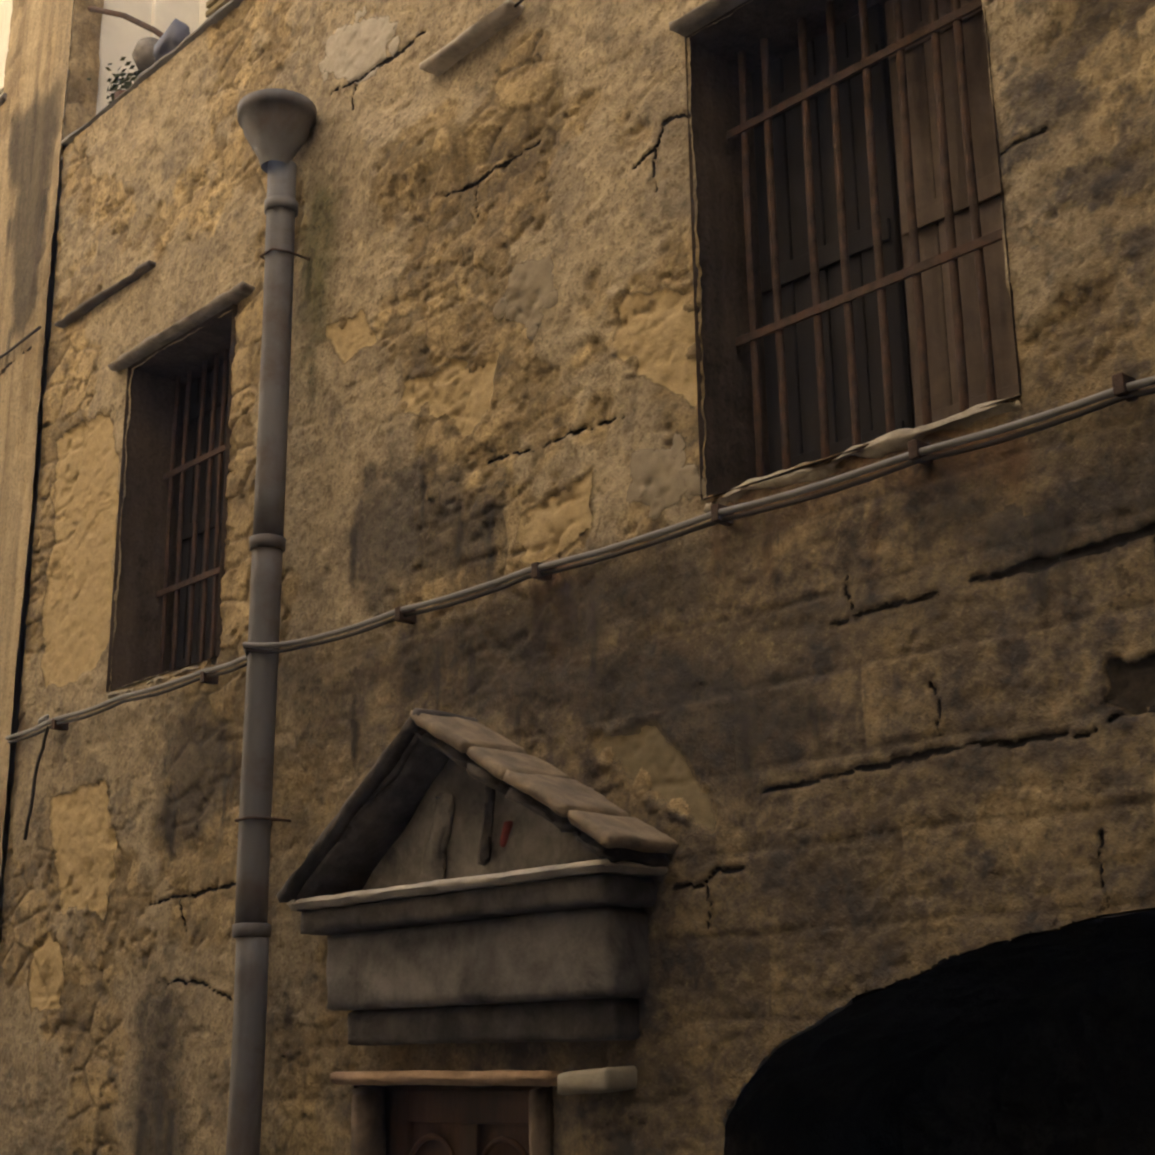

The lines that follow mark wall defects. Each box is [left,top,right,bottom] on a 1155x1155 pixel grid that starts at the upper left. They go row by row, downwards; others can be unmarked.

crack [632,113,691,192]
spalling [1104,647,1155,735]
crack [762,682,1120,794]
crack [1098,829,1108,903]